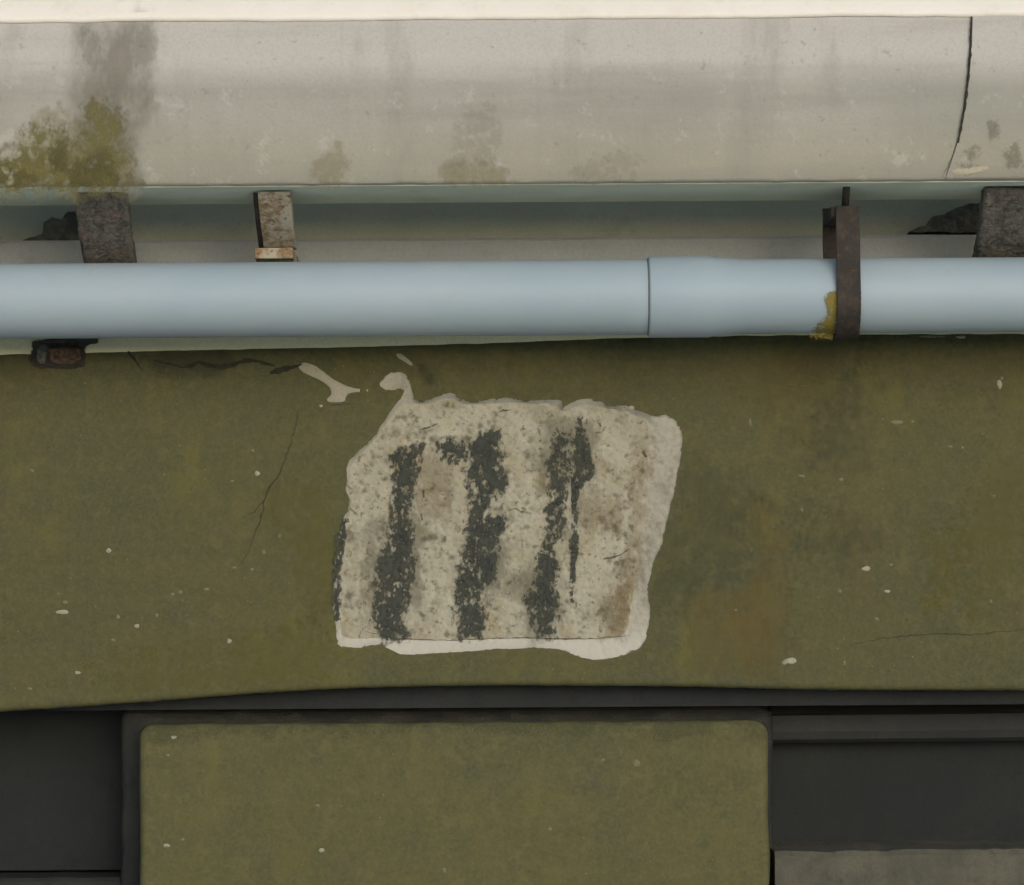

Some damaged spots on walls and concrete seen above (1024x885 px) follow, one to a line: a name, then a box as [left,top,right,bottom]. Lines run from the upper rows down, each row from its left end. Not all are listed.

crack [957,16,972,143]
spalling [299,353,683,660]